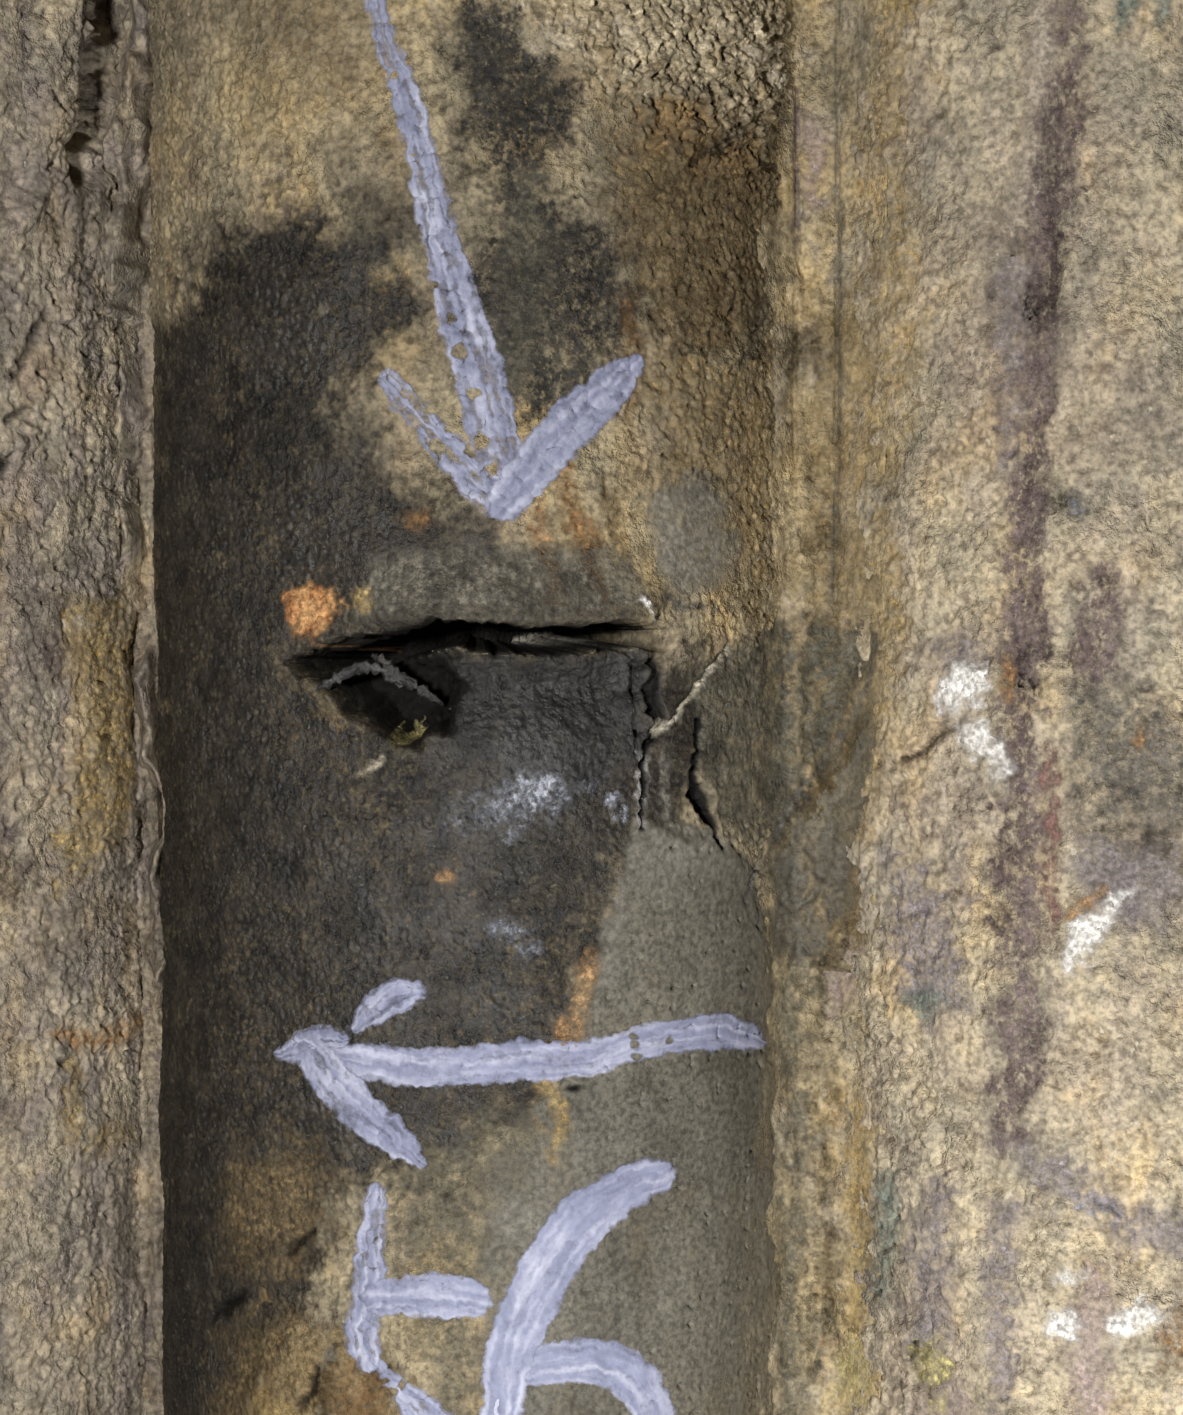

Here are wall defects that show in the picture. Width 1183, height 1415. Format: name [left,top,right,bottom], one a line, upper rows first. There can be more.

corrosion [281,582,372,636]
crack [316,540,729,849]
crack [743,642,876,904]
leakage [879,0,1183,1257]
peeling [395,619,872,1415]